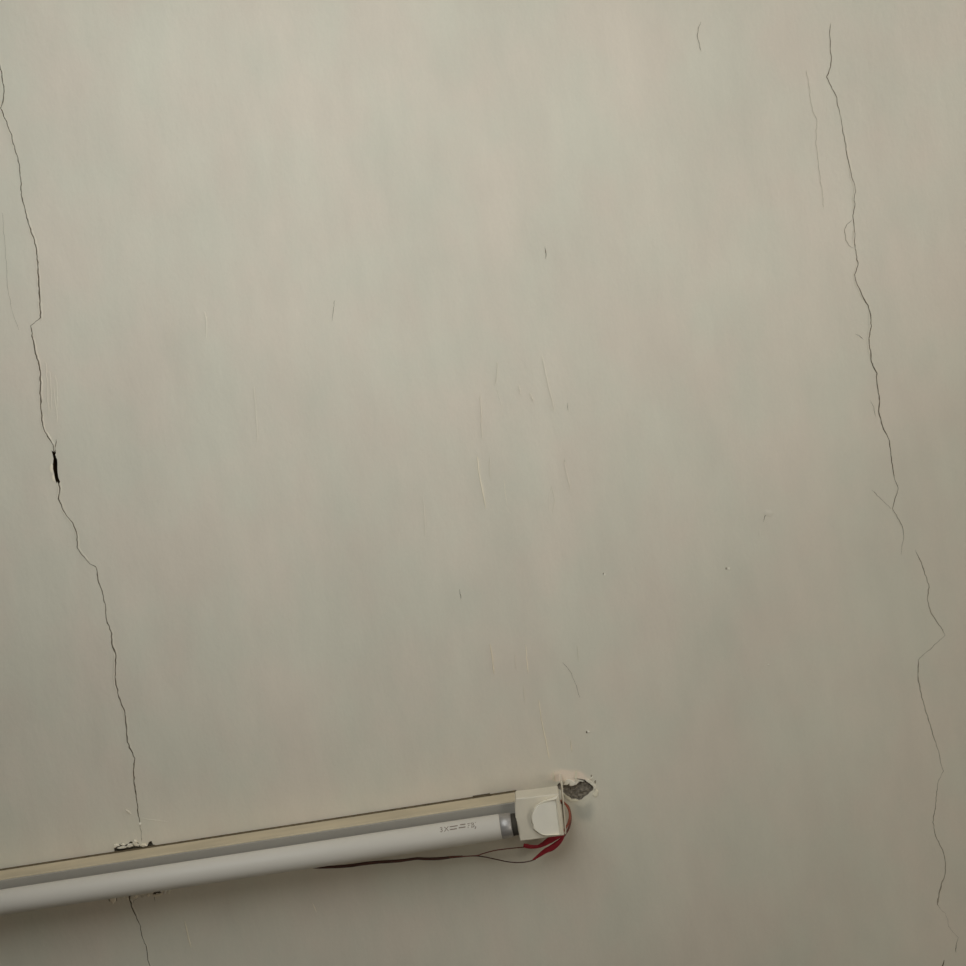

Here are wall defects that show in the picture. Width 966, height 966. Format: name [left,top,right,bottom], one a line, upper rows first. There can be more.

crack [0,62,166,841]
crack [129,894,155,966]
spalling [539,766,598,802]
crack [806,25,958,966]